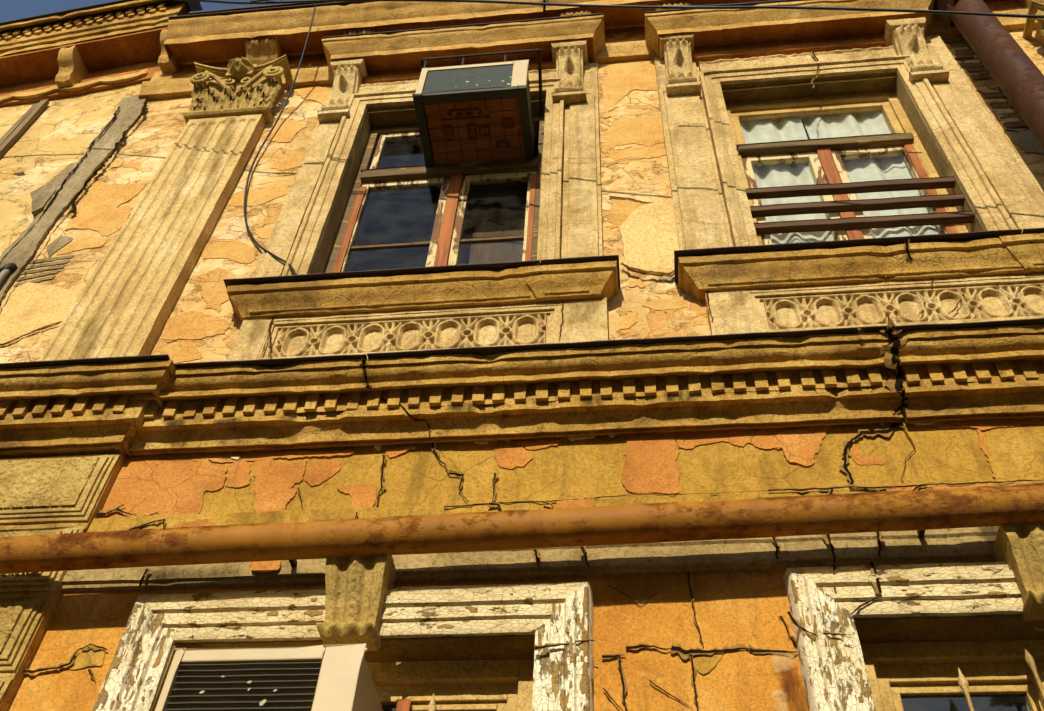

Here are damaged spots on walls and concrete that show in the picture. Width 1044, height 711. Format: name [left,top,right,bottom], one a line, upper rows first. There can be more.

peeling [601,59,666,164]
flaking render [942,34,1044,155]
peeling [0,181,146,344]
crack [621,262,674,278]
crack [359,278,1044,512]
corrosion [60,529,153,541]
peeling [98,450,355,528]
crack [354,455,387,519]
peeling [608,426,830,495]
crack [23,644,107,682]
peeling [546,587,590,711]
crack [534,532,886,711]